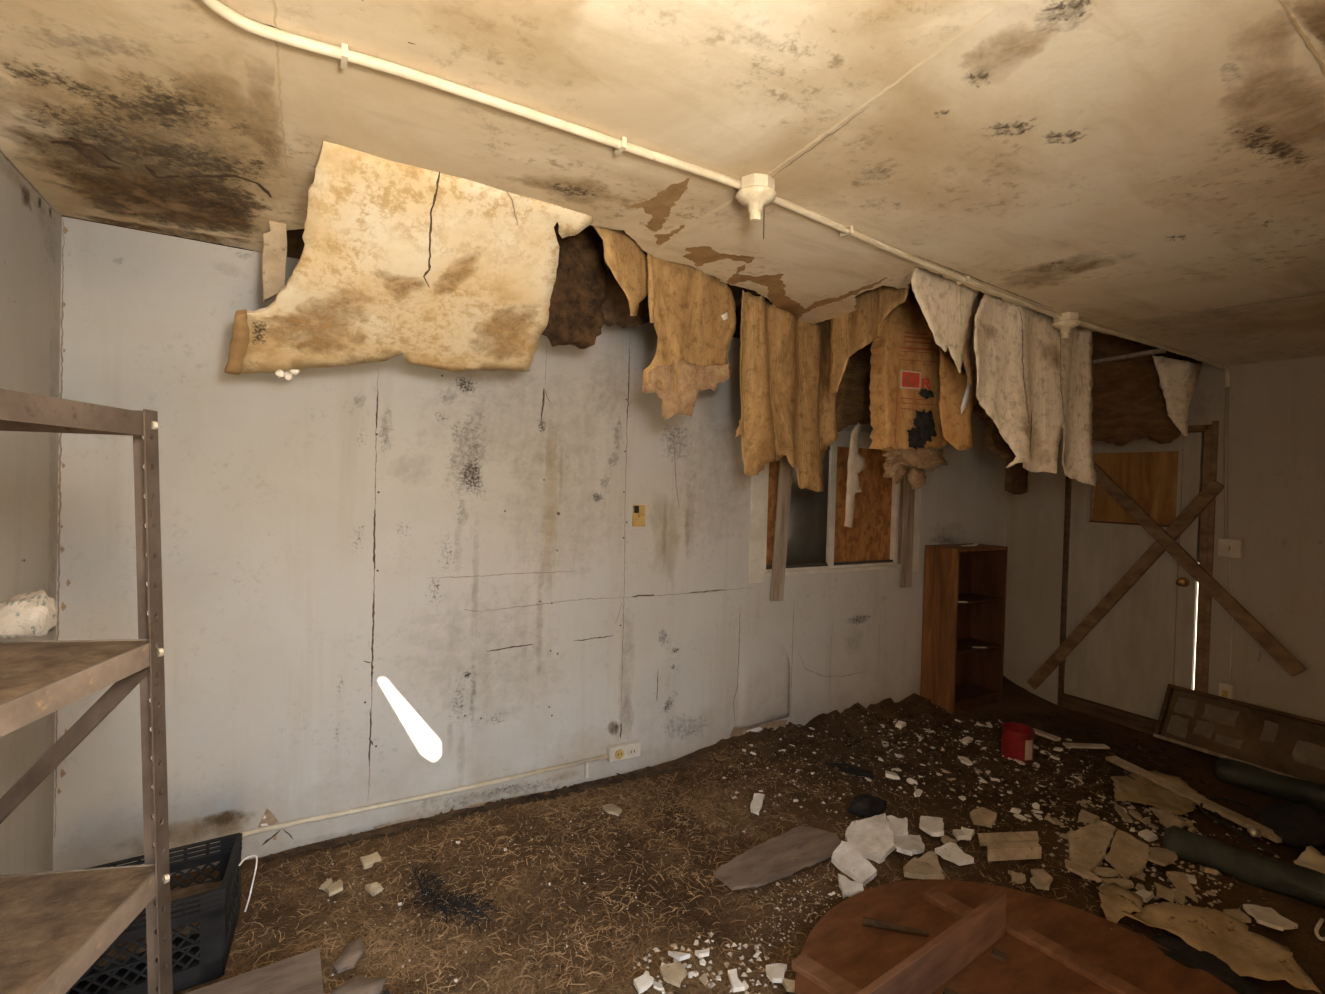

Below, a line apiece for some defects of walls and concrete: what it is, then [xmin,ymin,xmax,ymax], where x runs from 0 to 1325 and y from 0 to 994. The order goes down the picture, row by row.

water stain [1047,0,1089,21]
water stain [6,0,288,236]
water stain [1236,92,1325,164]
crack [423,172,440,286]
spalling [225,309,250,375]
peeling [275,369,300,380]
water stain [462,460,483,489]